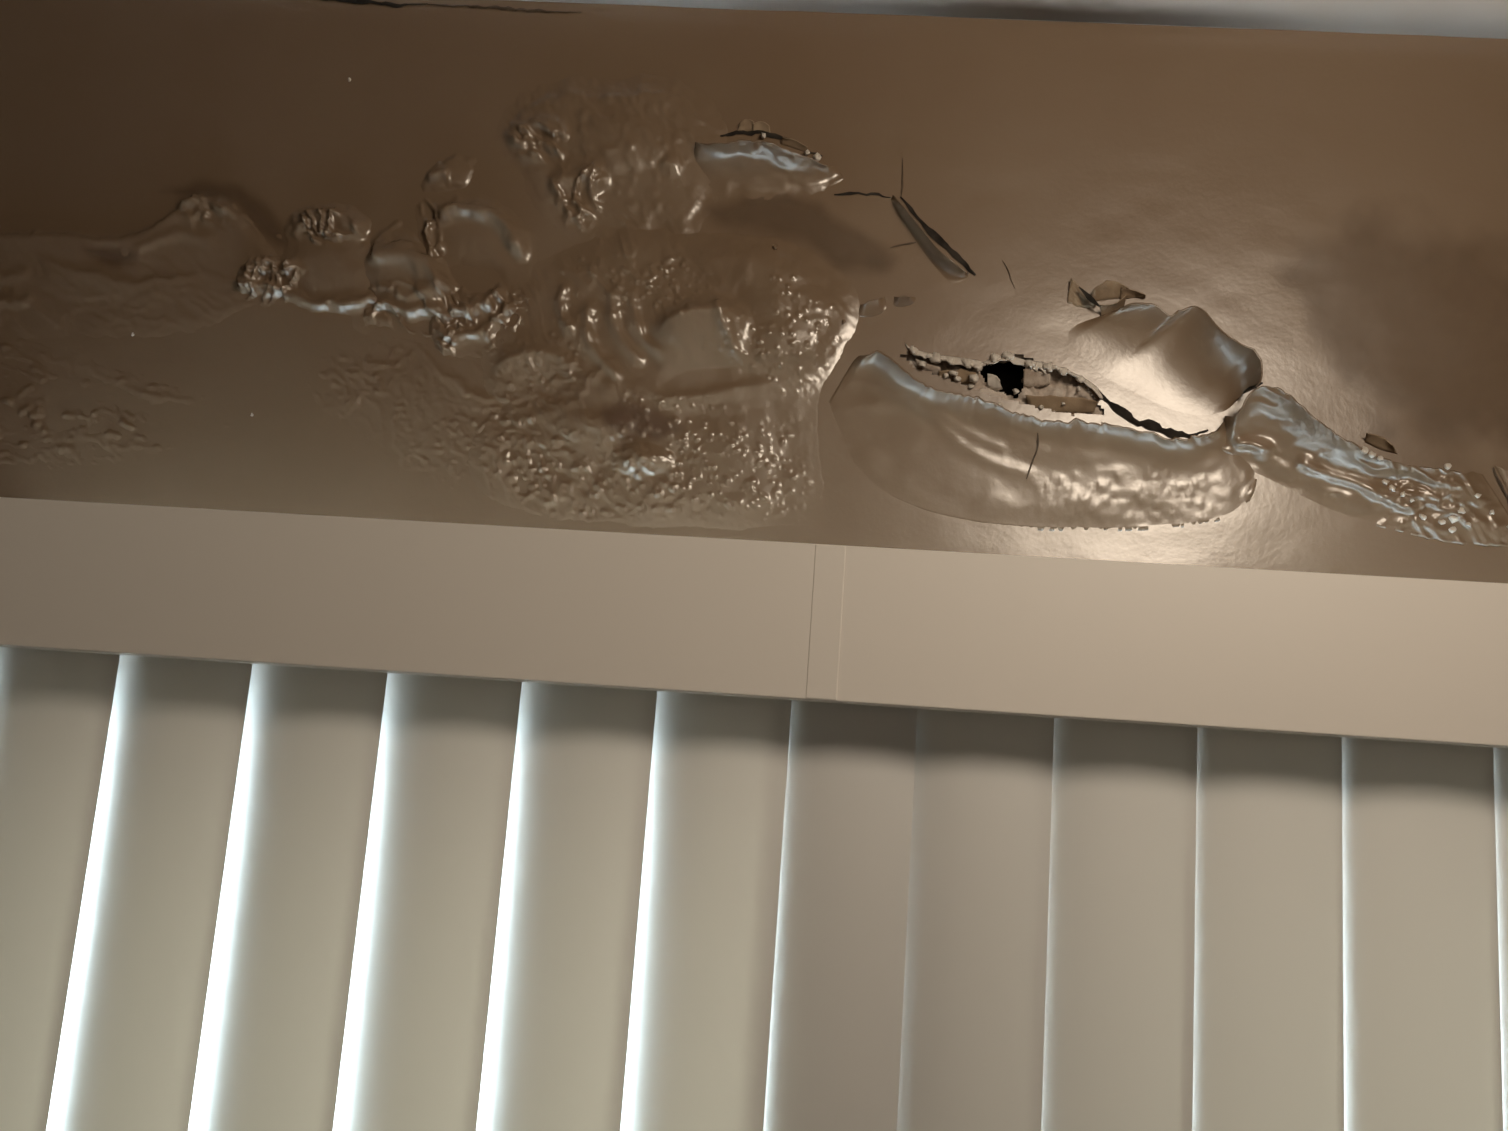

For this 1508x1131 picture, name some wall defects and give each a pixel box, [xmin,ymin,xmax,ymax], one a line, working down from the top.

crack [834,158,1015,288]
peeling [858,295,916,317]
peeling [900,302,1263,438]
leakage [1291,235,1508,432]